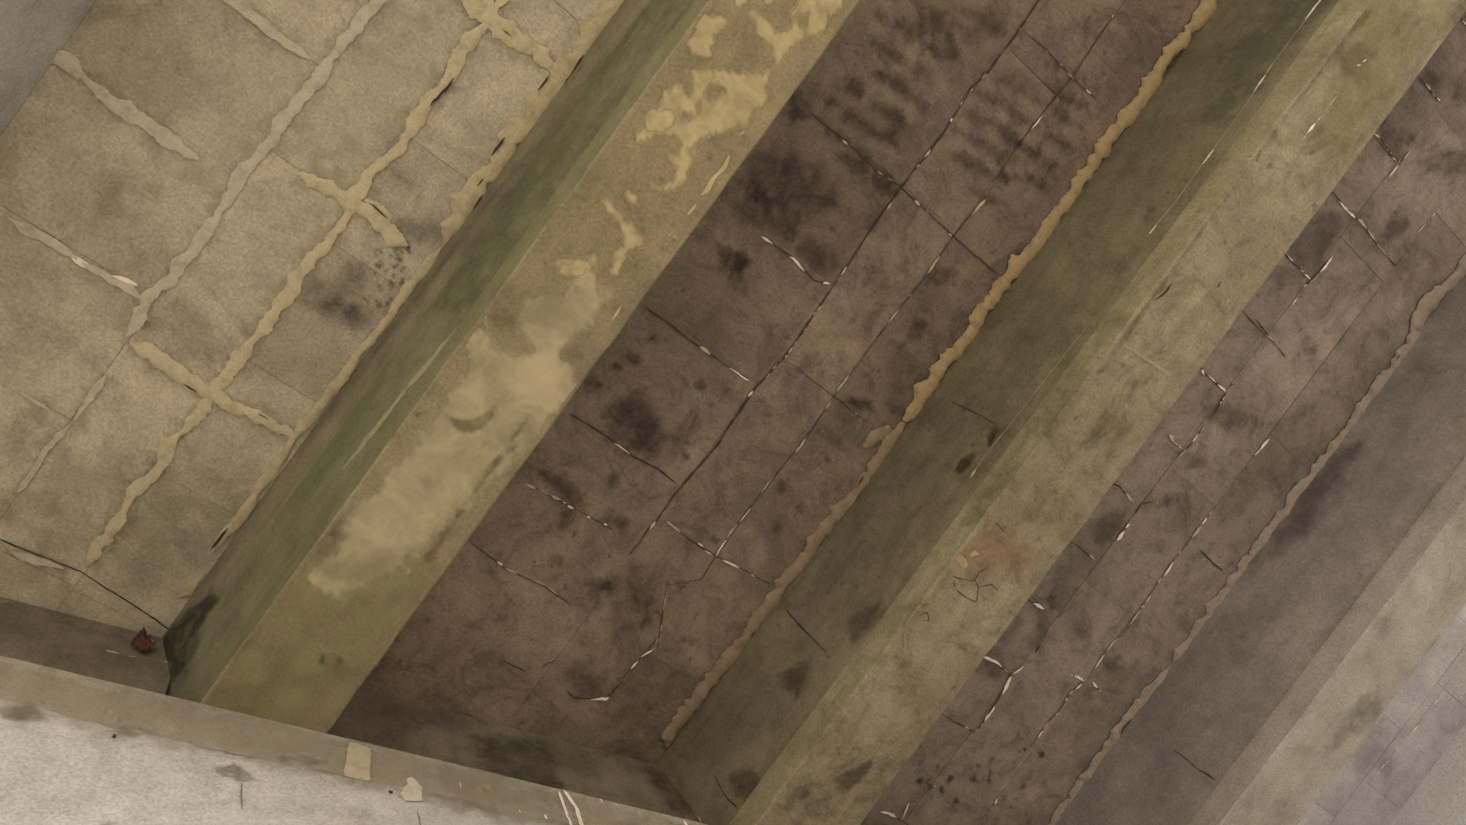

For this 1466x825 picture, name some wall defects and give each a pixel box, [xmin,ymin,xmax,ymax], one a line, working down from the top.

leakage [307,254,613,604]
crack [473,137,505,210]
peeling [600,0,843,275]
crack [500,0,1114,701]
leakage [956,326,1087,478]
leakage [1149,0,1321,234]
crack [1285,254,1333,304]
crack [1331,192,1396,266]
crack [0,539,169,630]
crack [919,567,1065,733]
crack [1070,483,1151,560]
crack [1035,504,1225,741]